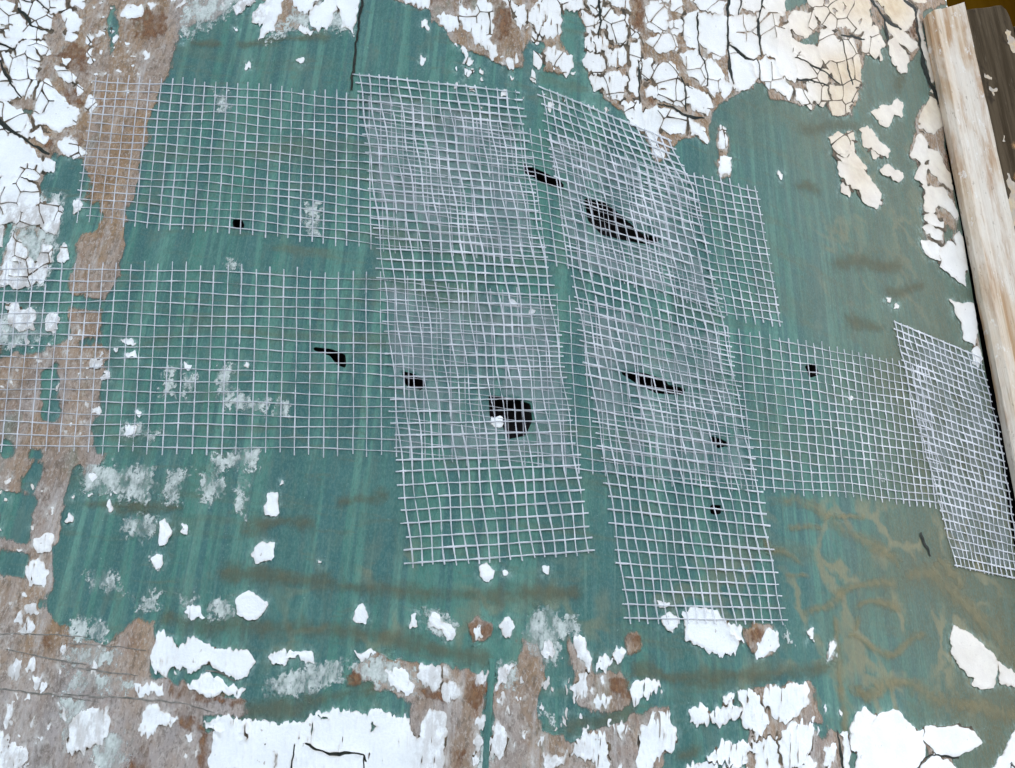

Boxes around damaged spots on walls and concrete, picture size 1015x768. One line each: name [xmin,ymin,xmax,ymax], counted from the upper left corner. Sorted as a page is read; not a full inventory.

crack [308,0,364,90]
crack [0,0,113,313]
peeling [395,0,968,287]
crack [457,0,939,206]
peeling [949,299,983,368]
peeling [0,0,677,768]
peeling [657,600,780,660]
peeling [949,625,1015,690]
crack [290,733,370,768]
crack [706,691,857,768]
peeling [686,680,982,768]
crack [915,723,976,768]